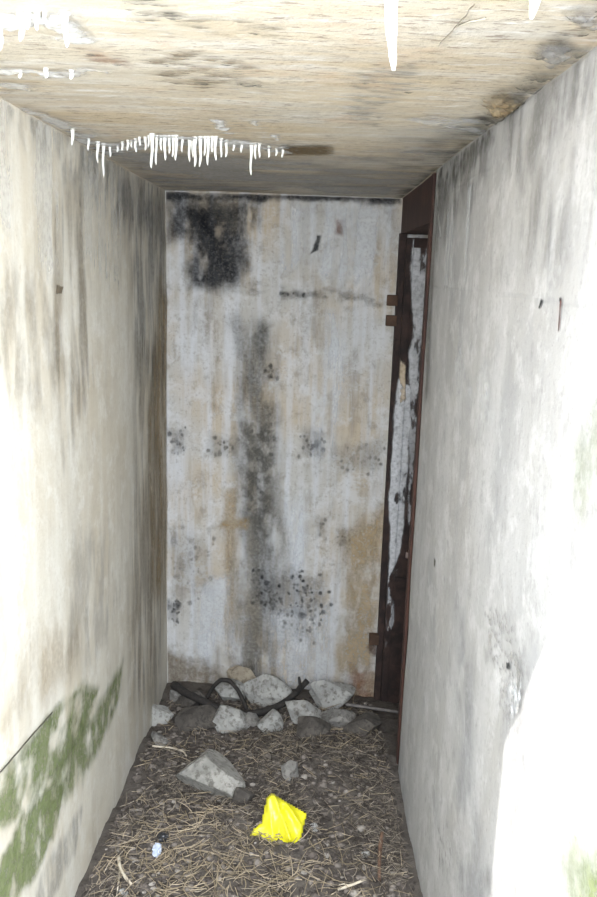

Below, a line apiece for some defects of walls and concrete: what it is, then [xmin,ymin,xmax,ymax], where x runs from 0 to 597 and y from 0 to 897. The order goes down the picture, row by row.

leakage [25,110,490,289]
leakage [221,336,333,680]
peeling [389,241,427,576]
leakage [0,670,122,897]